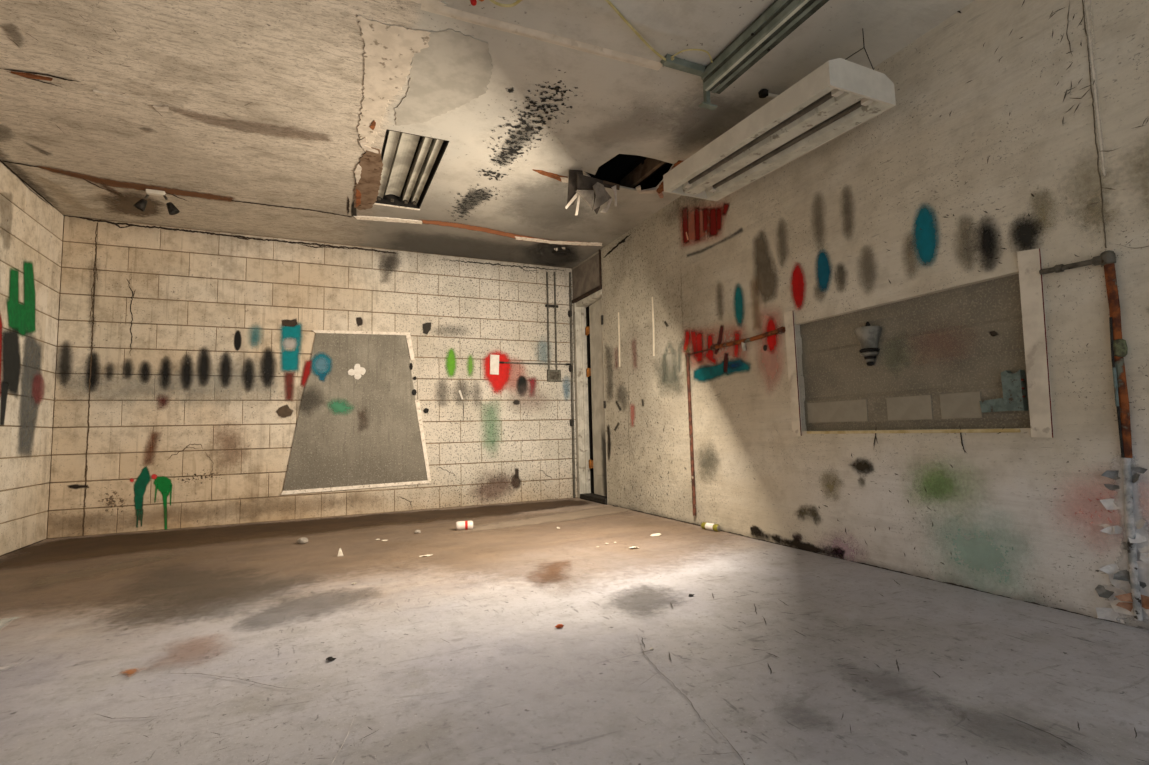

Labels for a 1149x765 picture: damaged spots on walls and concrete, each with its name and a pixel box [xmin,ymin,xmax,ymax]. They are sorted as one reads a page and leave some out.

peeling [354,164,422,224]
peeling [357,15,493,154]
damp [451,70,582,221]
peeling [1085,0,1105,175]